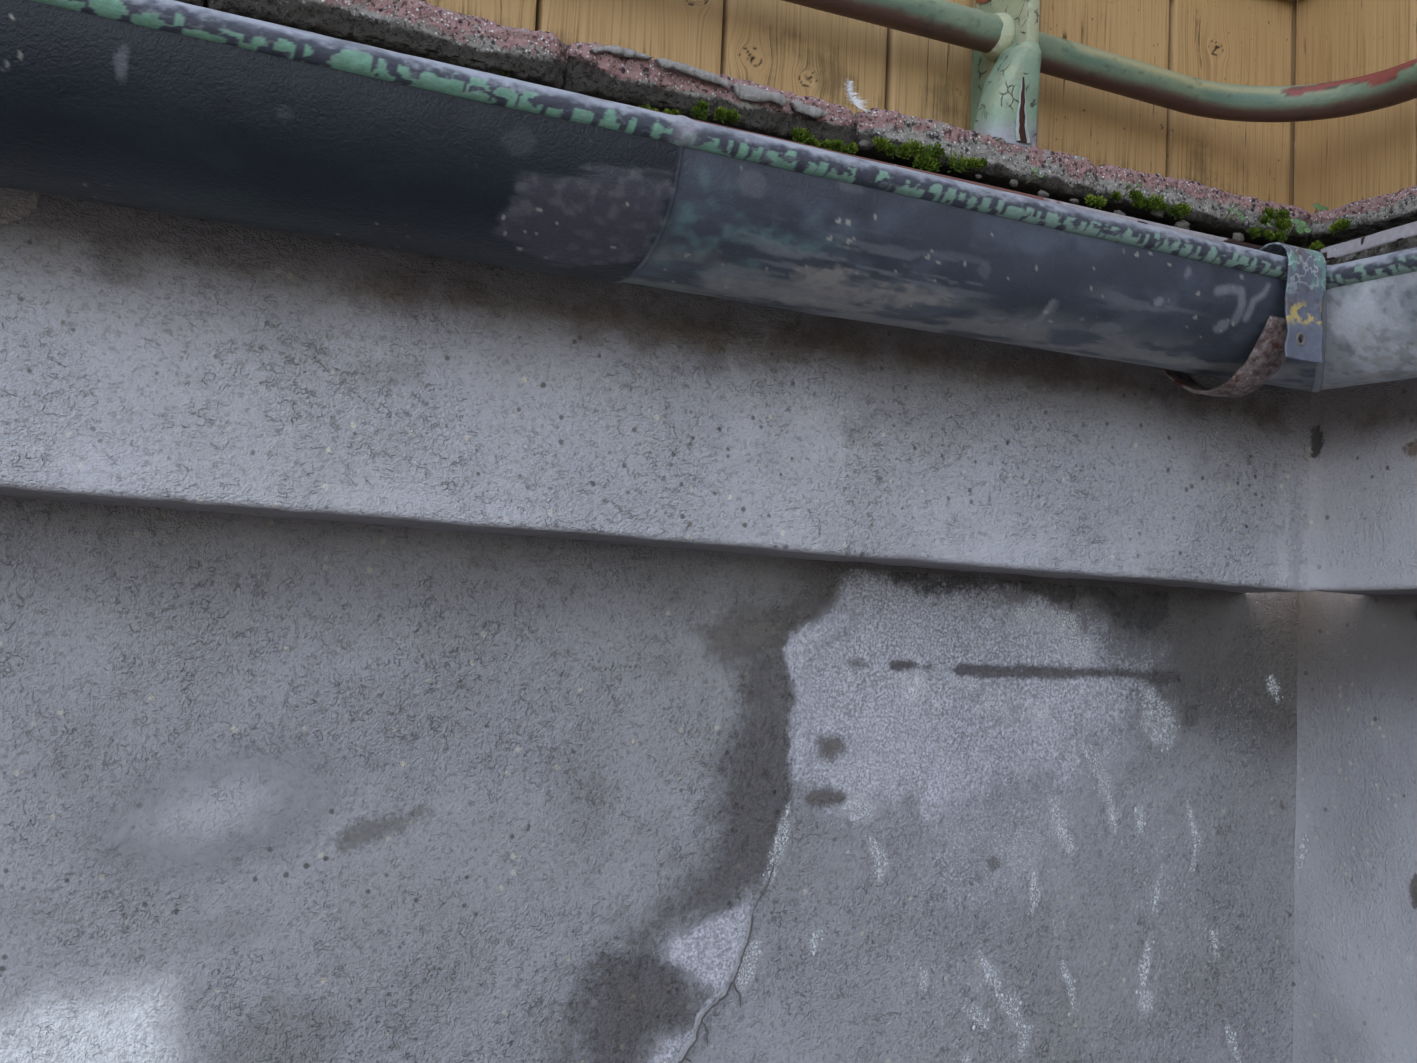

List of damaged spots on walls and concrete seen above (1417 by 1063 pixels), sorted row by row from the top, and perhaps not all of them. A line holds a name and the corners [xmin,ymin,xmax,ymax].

leakage [572,571,1198,1063]
crack [671,864,775,1063]
leakage [1223,1023,1242,1063]